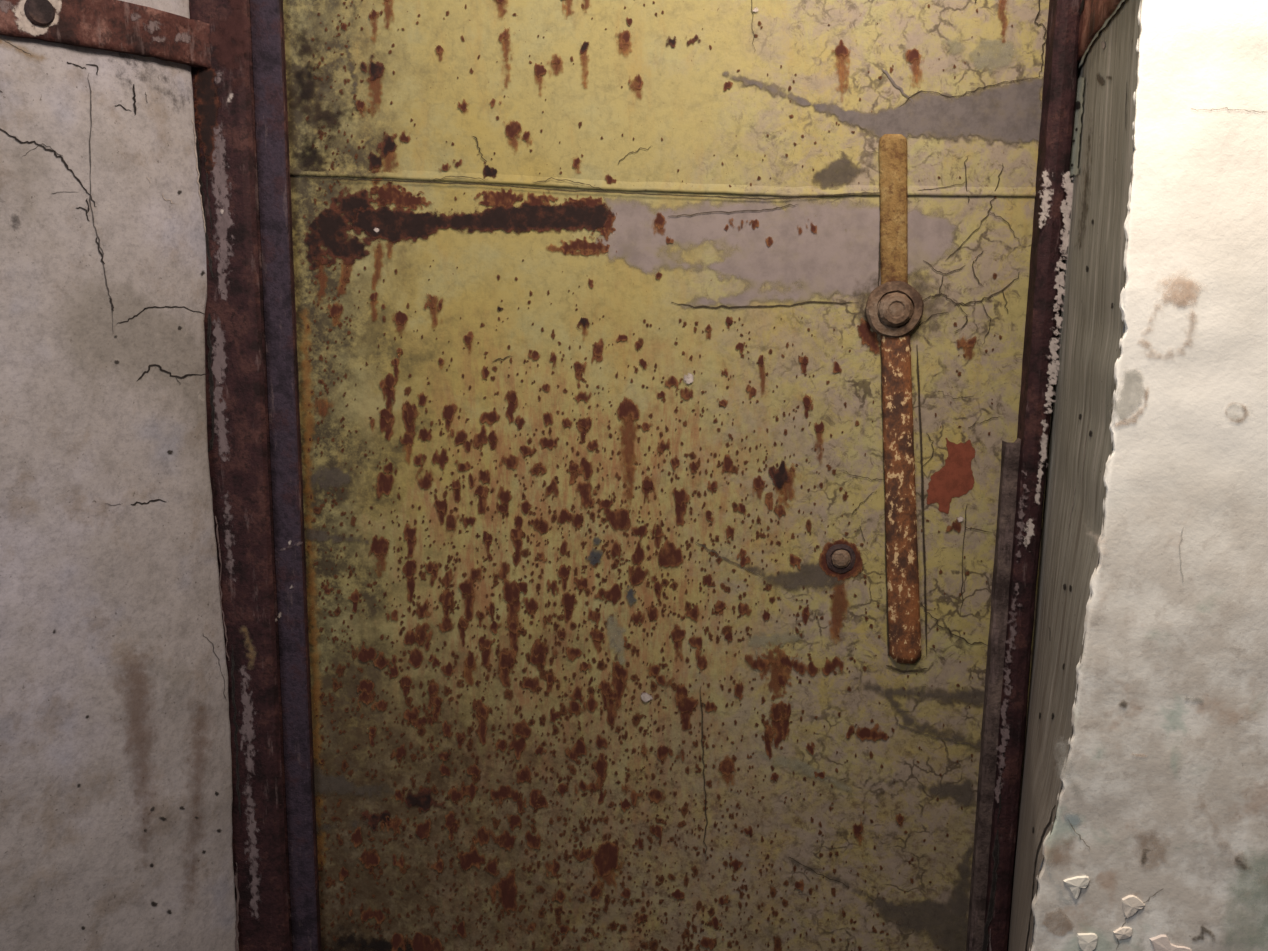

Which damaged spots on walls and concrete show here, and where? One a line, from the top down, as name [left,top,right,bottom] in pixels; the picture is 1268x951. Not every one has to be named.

corrosion [998,0,1013,43]
corrosion [193,68,221,174]
crack [0,62,215,452]
peeling [595,196,881,311]
peeling [907,209,958,275]
corrosion [953,322,1002,376]
peeling [1015,170,1074,562]
corrosion [300,0,895,951]
peeling [927,438,976,522]
peeling [1063,875,1090,899]
peeling [1077,933,1097,951]
peeling [1113,895,1145,940]